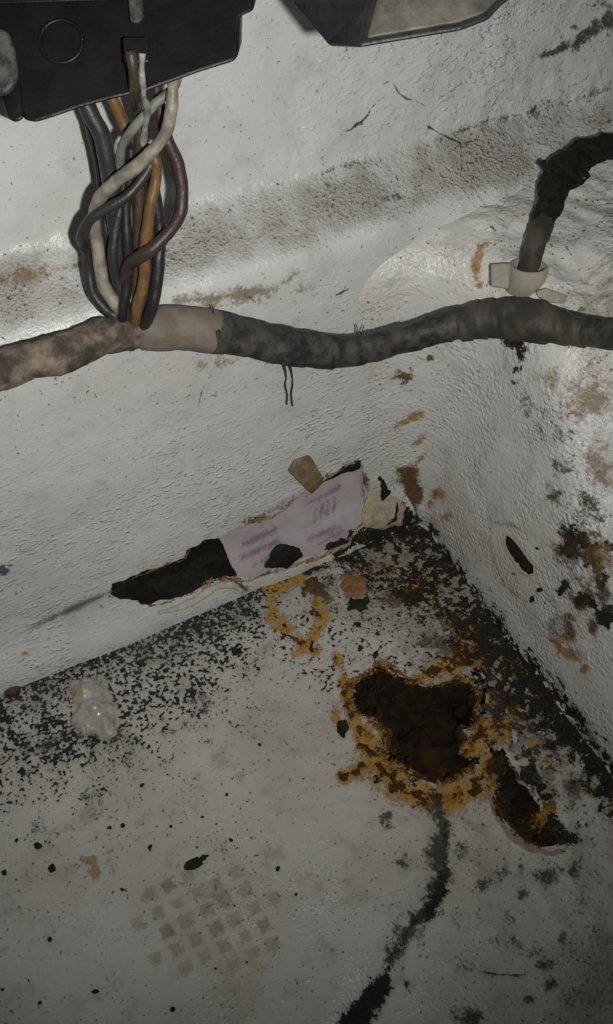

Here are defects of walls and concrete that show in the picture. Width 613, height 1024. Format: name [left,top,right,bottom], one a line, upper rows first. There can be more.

rust [470,241,490,289]
rust [393,411,425,429]
leakage [560,377,608,418]
leakage [586,451,612,486]
spalling [110,538,237,605]
spalling [505,536,539,575]
leakage [555,523,613,631]
rust [199,435,613,824]
peeling [0,574,582,856]
peeling [408,860,453,928]
peeling [336,966,411,1024]